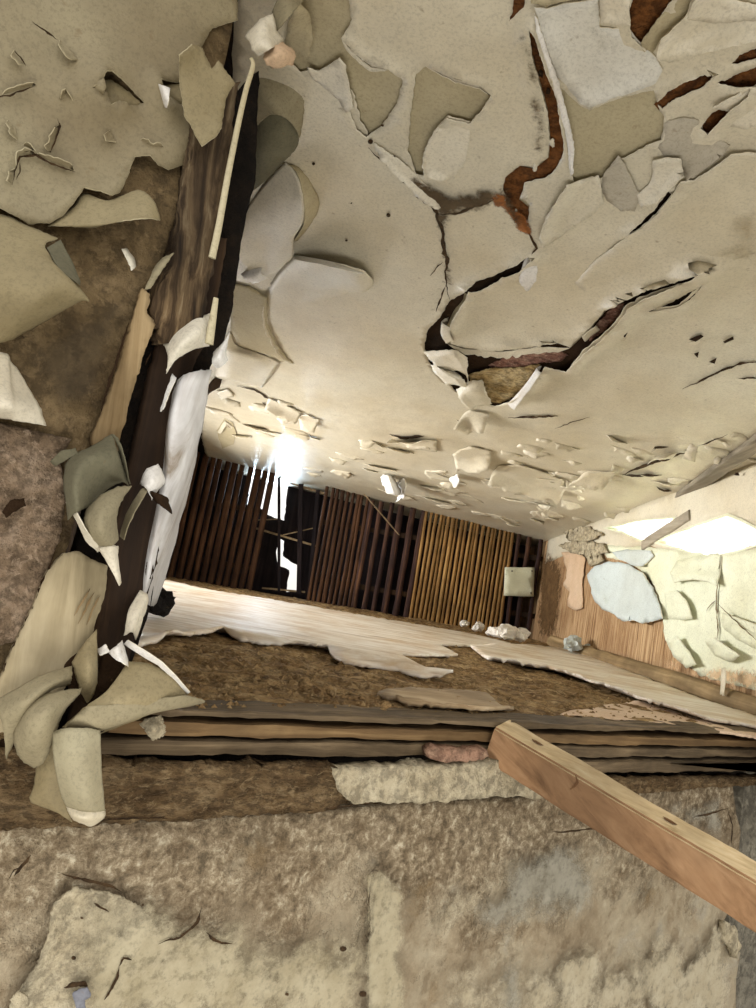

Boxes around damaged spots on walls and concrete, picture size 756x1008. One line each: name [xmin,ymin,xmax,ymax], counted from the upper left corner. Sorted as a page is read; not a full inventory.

crack [368,143,494,311]
peeling [421,115,471,182]
rust [493,31,564,234]
peeling [533,0,756,291]
rust [654,49,756,110]
peeling [0,0,387,827]
peeling [304,258,756,696]